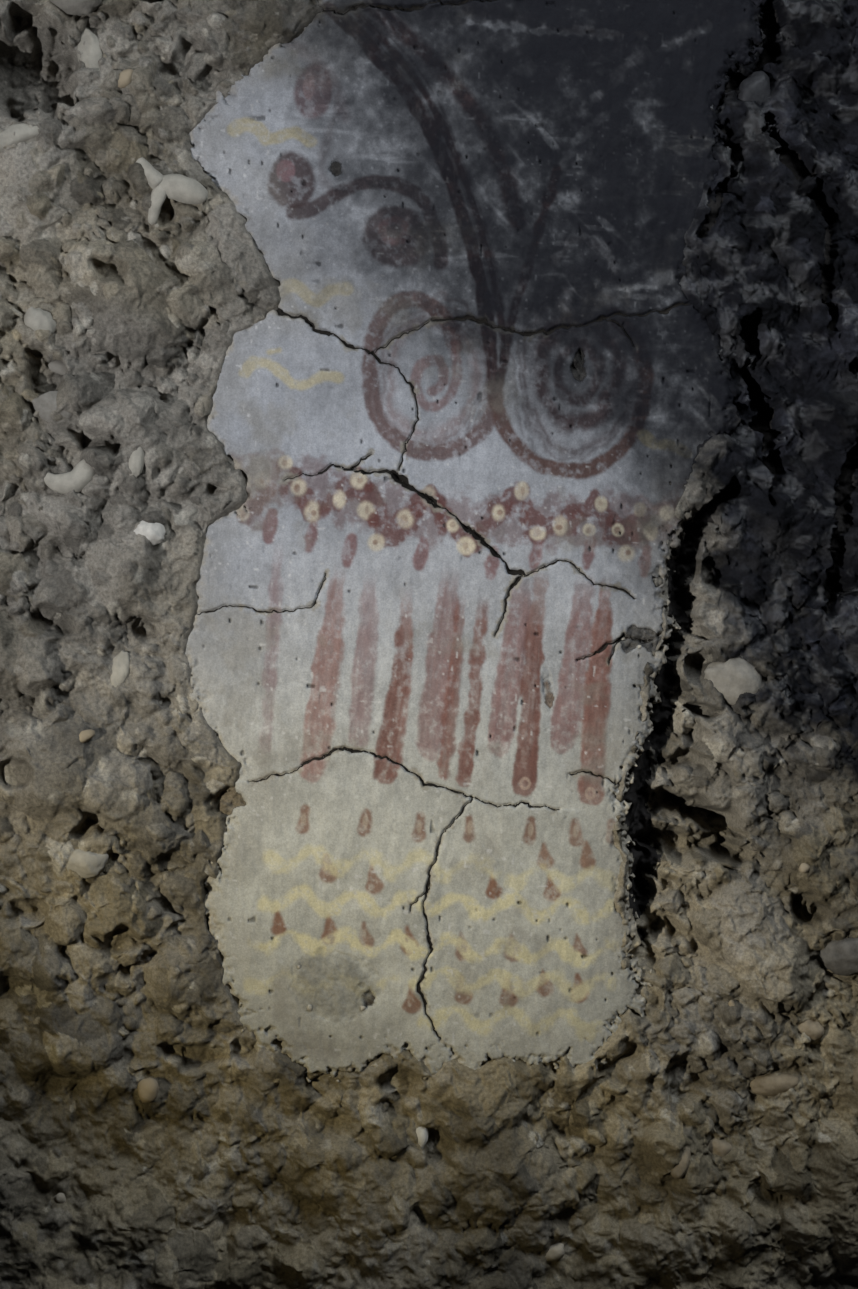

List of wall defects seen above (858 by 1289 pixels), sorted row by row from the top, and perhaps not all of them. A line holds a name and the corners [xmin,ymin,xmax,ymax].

spalling [330,162,341,176]
spalling [571,349,586,381]
crack [276,302,691,636]
crack [198,576,326,615]
crack [578,632,662,666]
spalling [620,625,661,653]
spalling [544,681,554,708]
spalling [219,787,246,815]
crack [249,747,560,1040]
spalling [359,991,375,1011]